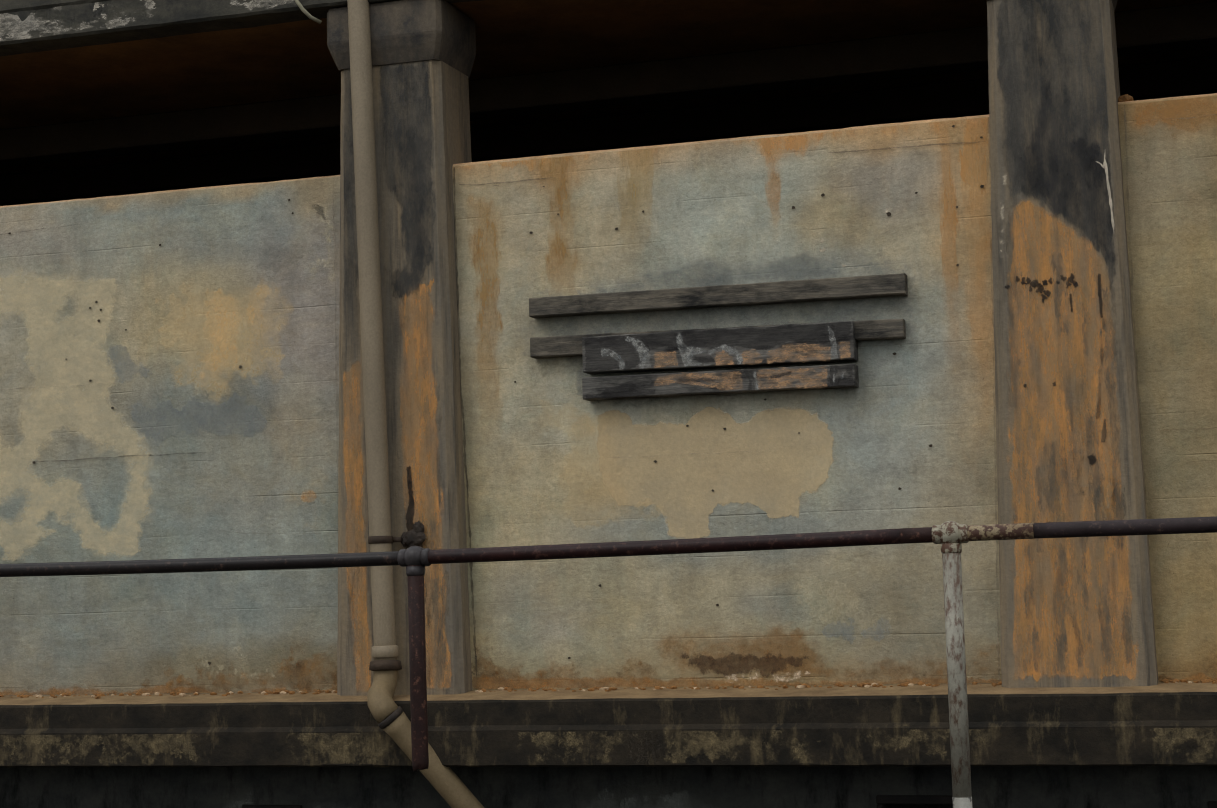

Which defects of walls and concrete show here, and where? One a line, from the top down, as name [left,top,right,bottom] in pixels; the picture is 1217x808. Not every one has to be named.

leakage [380,61,435,297]
corrosion [1005,201,1126,523]
corrosion [403,280,451,687]
corrosion [347,568,402,685]
corrosion [1013,536,1137,682]